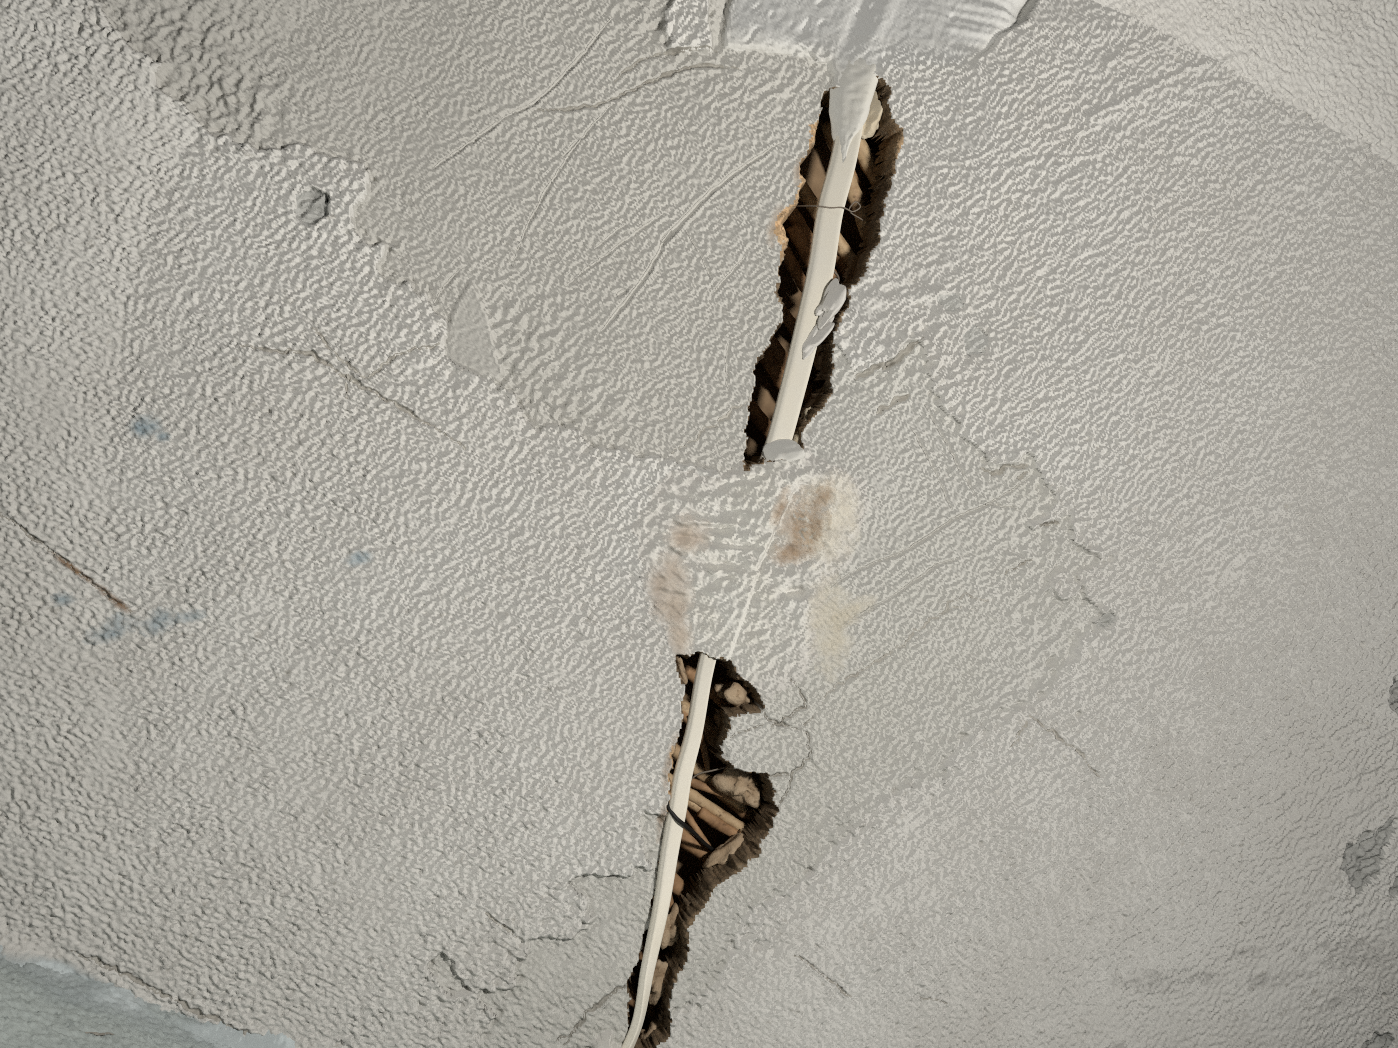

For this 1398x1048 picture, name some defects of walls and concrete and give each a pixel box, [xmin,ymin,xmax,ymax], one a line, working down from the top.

crack [537,45,739,112]
flaking render [96,0,833,473]
crack [241,327,466,450]
crack [0,512,133,612]
leakage [653,525,701,655]
leakage [775,503,835,559]
crack [1040,519,1060,527]
flaking render [668,339,1116,1017]
flaking render [1389,679,1398,714]
crack [556,559,1033,1048]
flaking render [1340,817,1398,898]